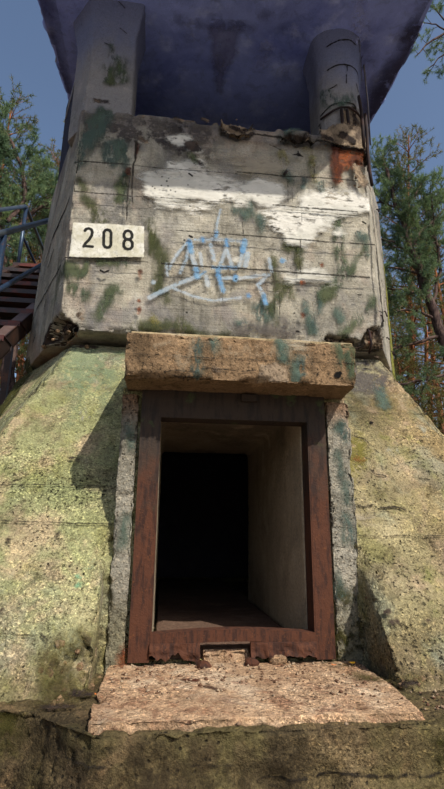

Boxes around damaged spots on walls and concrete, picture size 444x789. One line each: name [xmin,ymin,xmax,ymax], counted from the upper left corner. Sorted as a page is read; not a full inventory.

crack [31,37,387,341]
peeling [140,95,374,247]
corrosion [331,145,363,183]
spalling [41,312,98,350]
spalling [324,326,384,357]